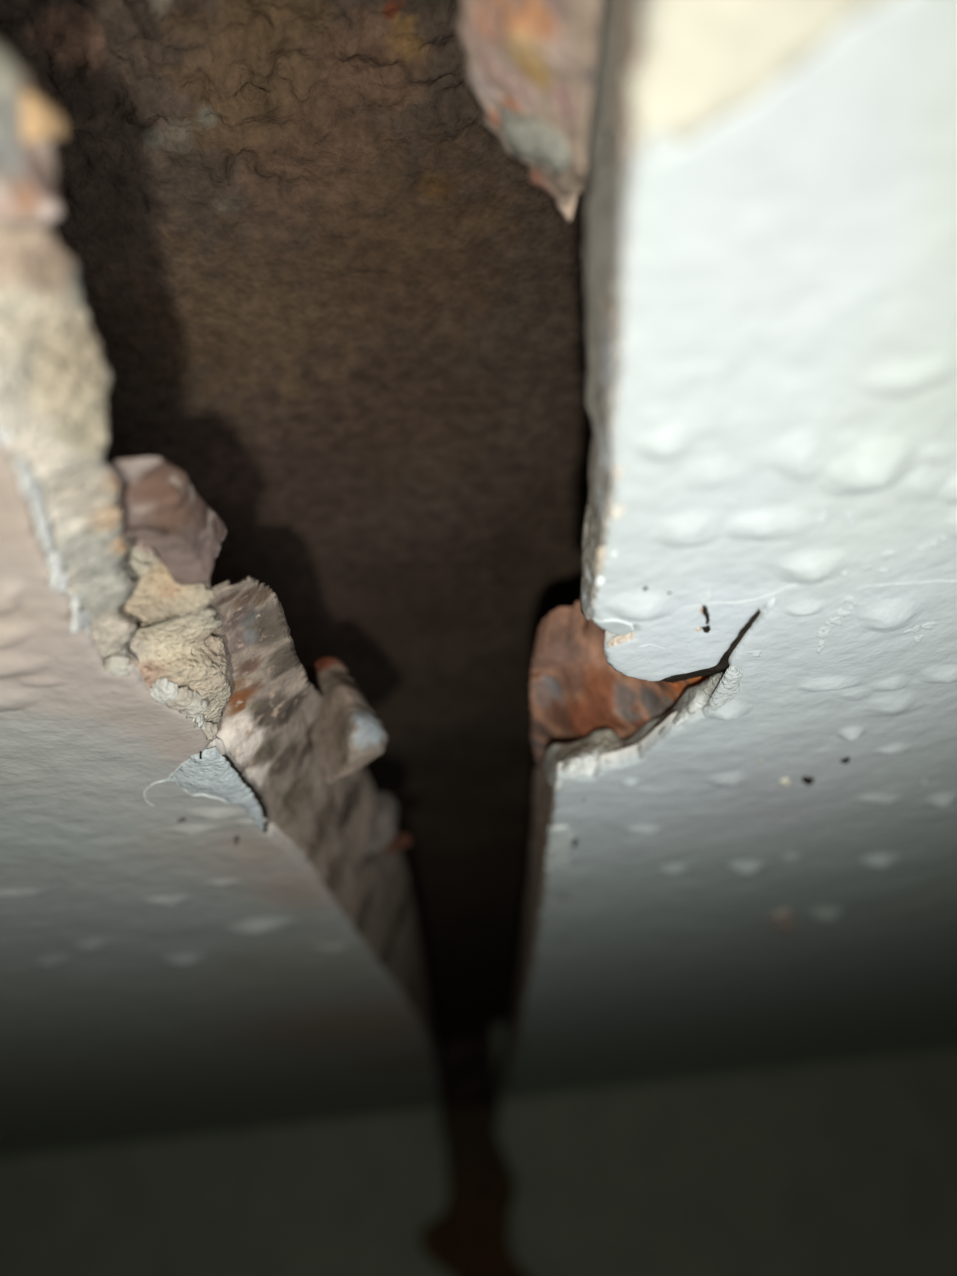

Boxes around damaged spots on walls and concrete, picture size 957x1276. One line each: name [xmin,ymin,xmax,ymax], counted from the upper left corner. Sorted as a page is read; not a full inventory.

flaking render [0,41,68,229]
flaking render [101,656,130,676]
spalling [142,678,269,834]
flaking render [305,656,389,784]
peeling [595,547,617,586]
spalling [529,601,743,792]
crack [681,536,957,671]